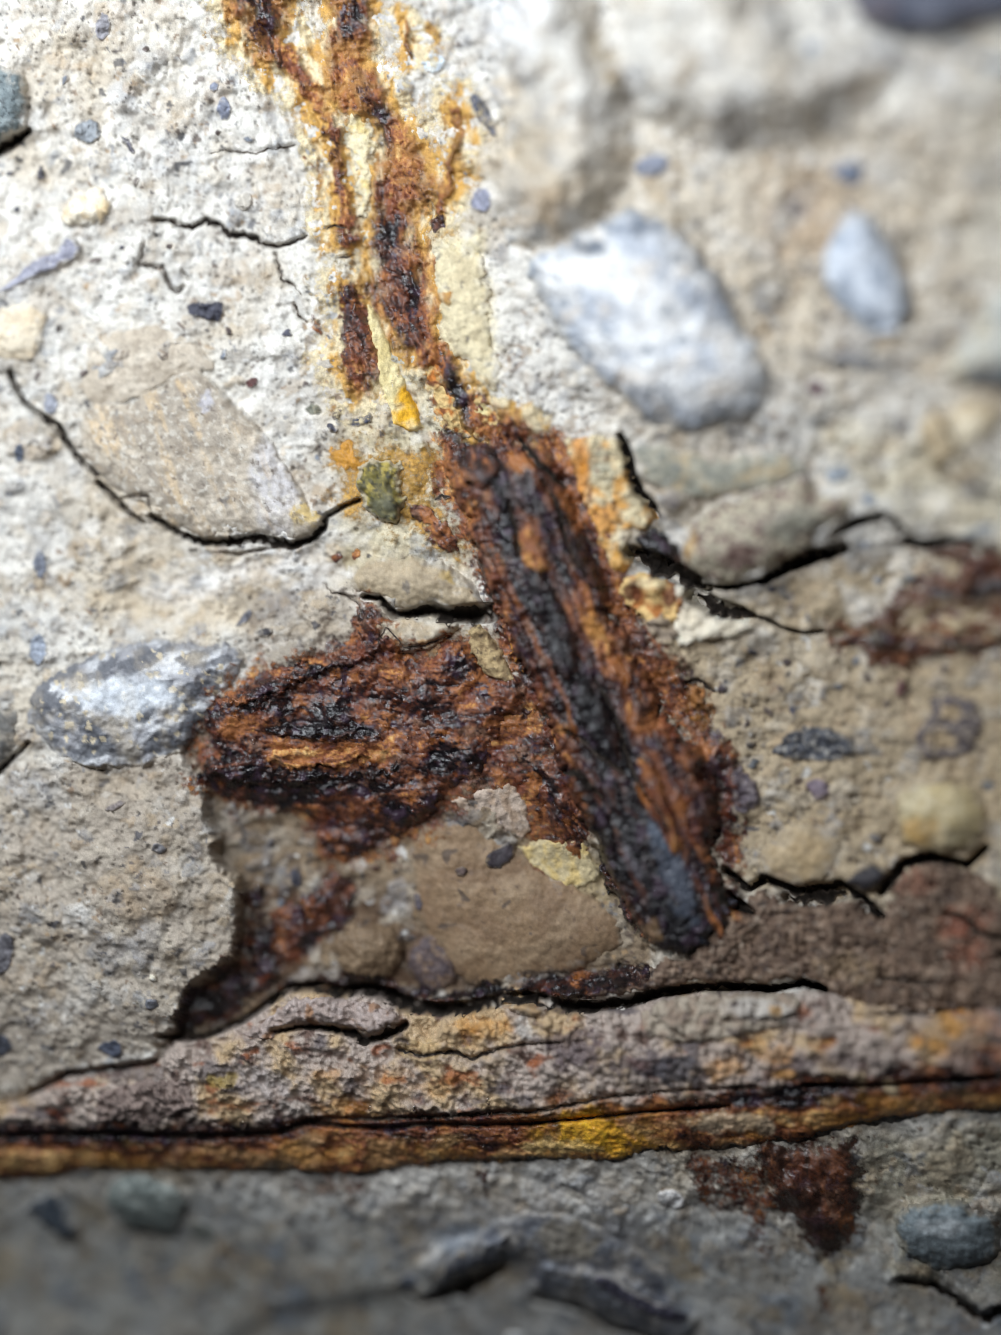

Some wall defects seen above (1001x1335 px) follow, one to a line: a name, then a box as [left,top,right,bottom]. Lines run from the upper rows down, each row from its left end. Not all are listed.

crack [137,218,355,323]
crack [8,372,360,556]
rust [182,0,748,954]
crack [325,583,493,655]
crack [635,511,972,633]
rust [824,533,1001,673]
spalling [0,931,15,975]
spalling [563,860,1001,1013]
crack [708,847,990,918]
spalling [0,1032,14,1057]
spalling [96,1039,124,1059]
rust [0,864,1001,1261]